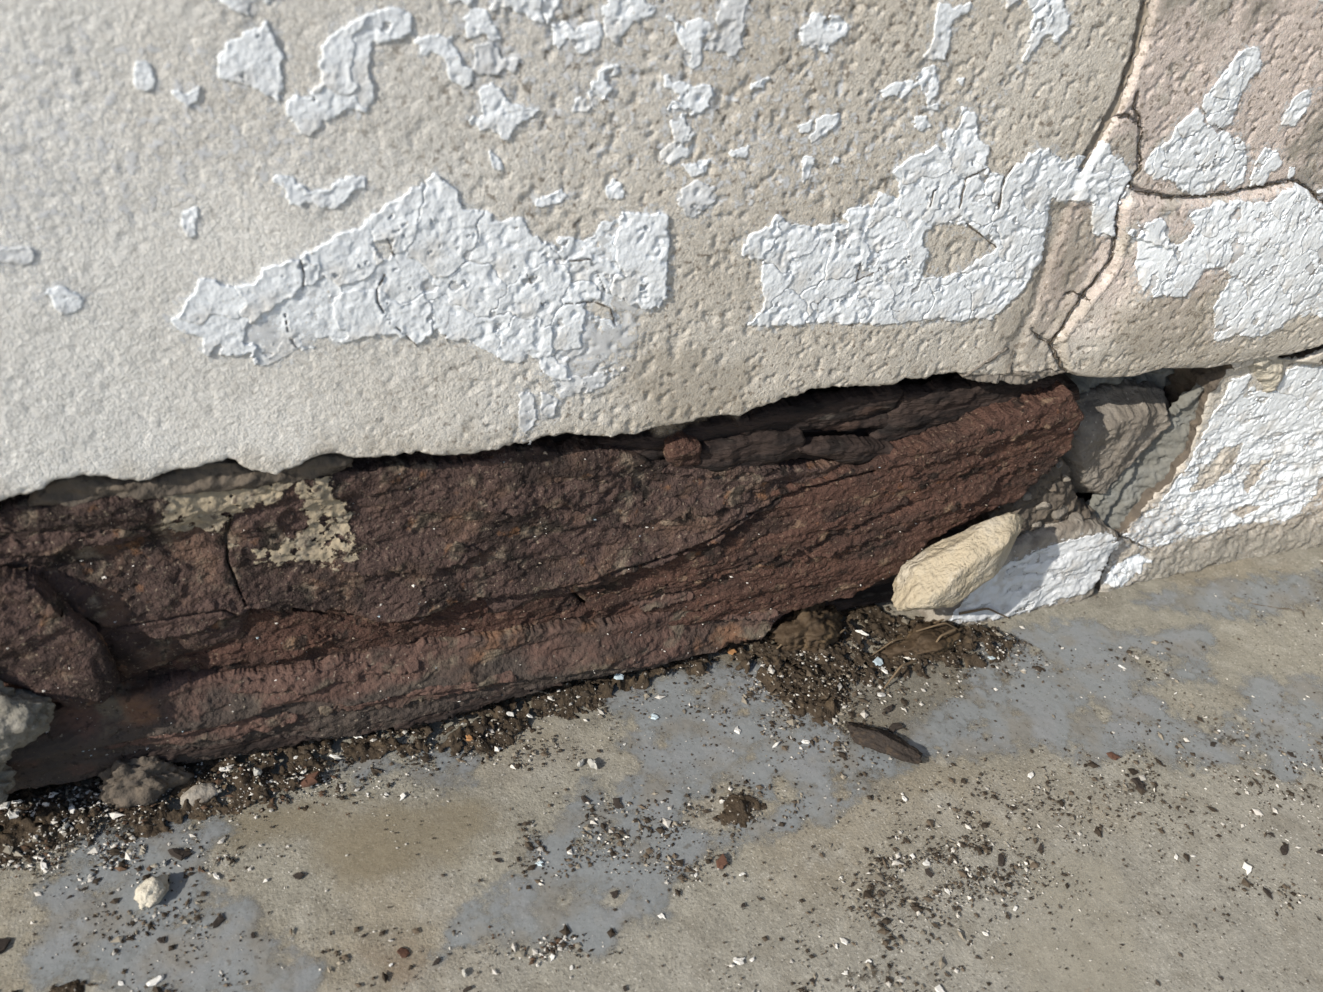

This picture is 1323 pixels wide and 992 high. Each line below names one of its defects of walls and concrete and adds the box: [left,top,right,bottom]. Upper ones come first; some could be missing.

peeling [162,0,1323,442]
crack [1030,91,1323,371]
flaking render [28,453,353,507]
corrosion [539,433,594,443]
corrosion [787,386,868,398]
corrosion [897,372,965,385]
corrosion [0,527,151,622]
corrosion [328,539,480,578]
peeling [904,347,1323,782]
peeling [0,566,120,710]
corrosion [846,722,923,765]
peeling [442,661,910,957]